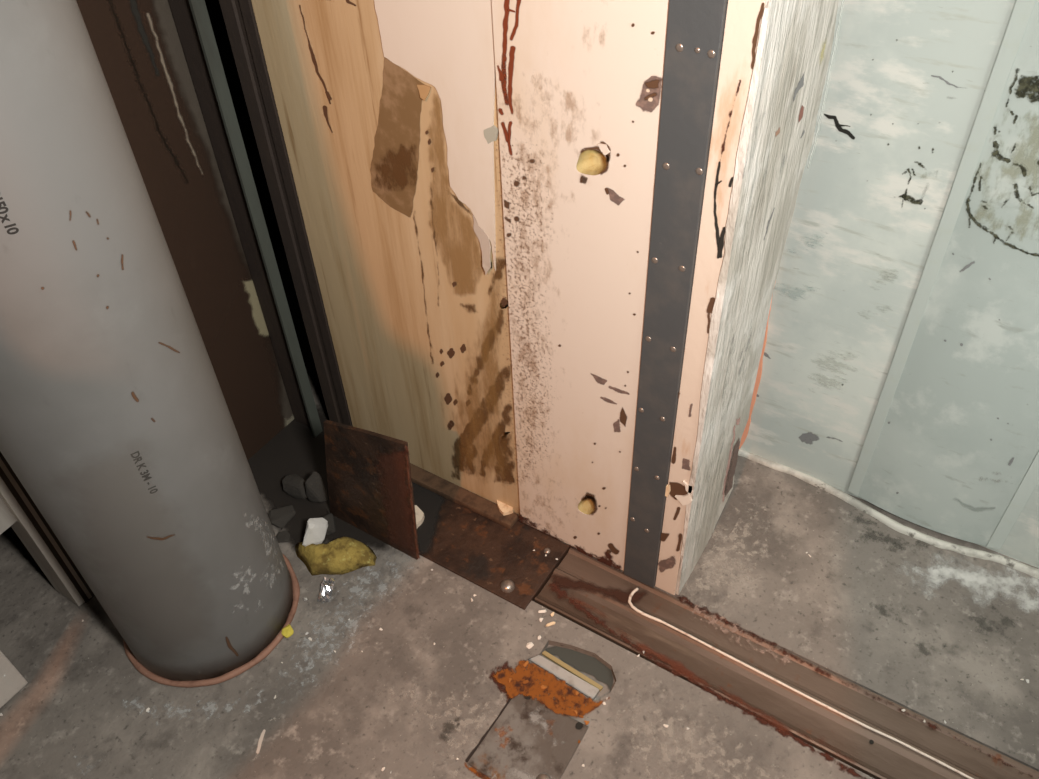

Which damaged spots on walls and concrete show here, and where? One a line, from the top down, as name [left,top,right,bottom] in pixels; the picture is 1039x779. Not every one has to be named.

rust [497,0,521,155]
peeling [374,0,499,294]
hole [576,142,611,184]
crack [824,114,855,139]
leakage [444,145,550,483]
leakage [436,344,466,378]
peeling [723,418,740,501]
hole [578,492,597,515]
rust [489,659,609,725]
rust [549,583,866,779]